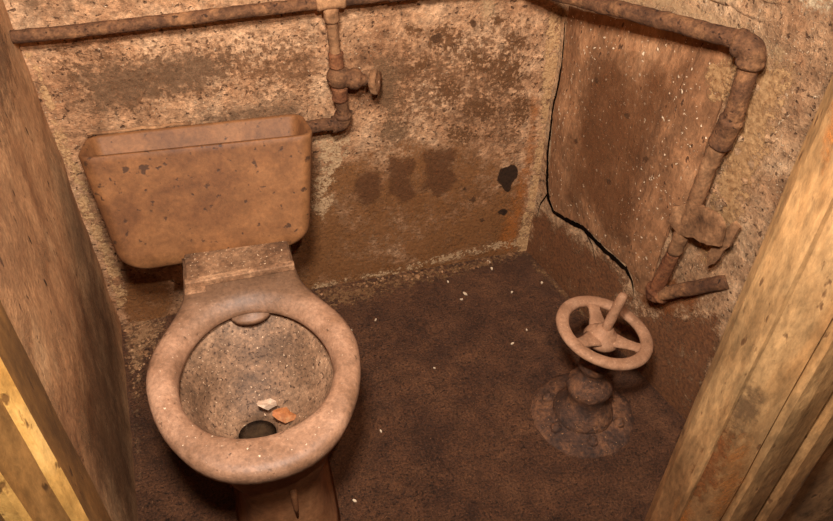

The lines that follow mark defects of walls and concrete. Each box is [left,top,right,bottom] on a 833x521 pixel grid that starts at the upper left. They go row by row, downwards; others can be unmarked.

leakage [49,30,318,122]
leakage [292,0,719,420]
crack [537,23,634,294]